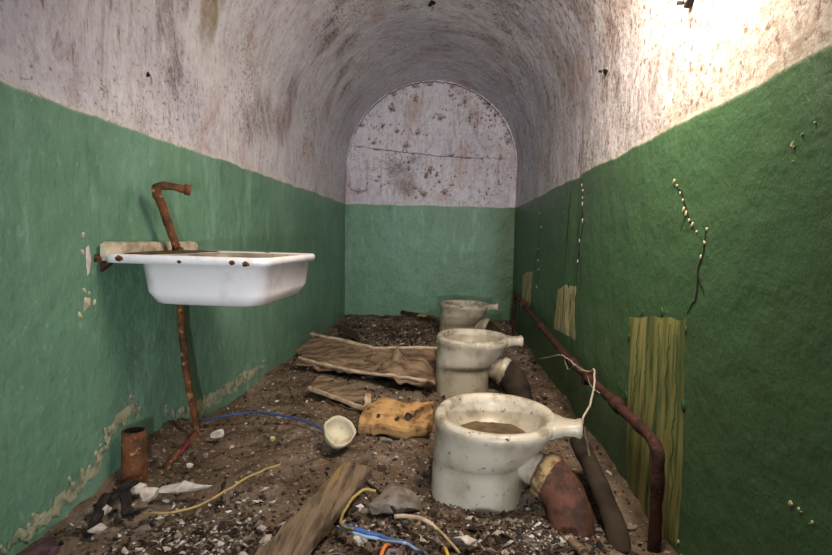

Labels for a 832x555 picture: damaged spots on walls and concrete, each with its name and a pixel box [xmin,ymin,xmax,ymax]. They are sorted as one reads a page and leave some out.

crack [673,179,708,313]